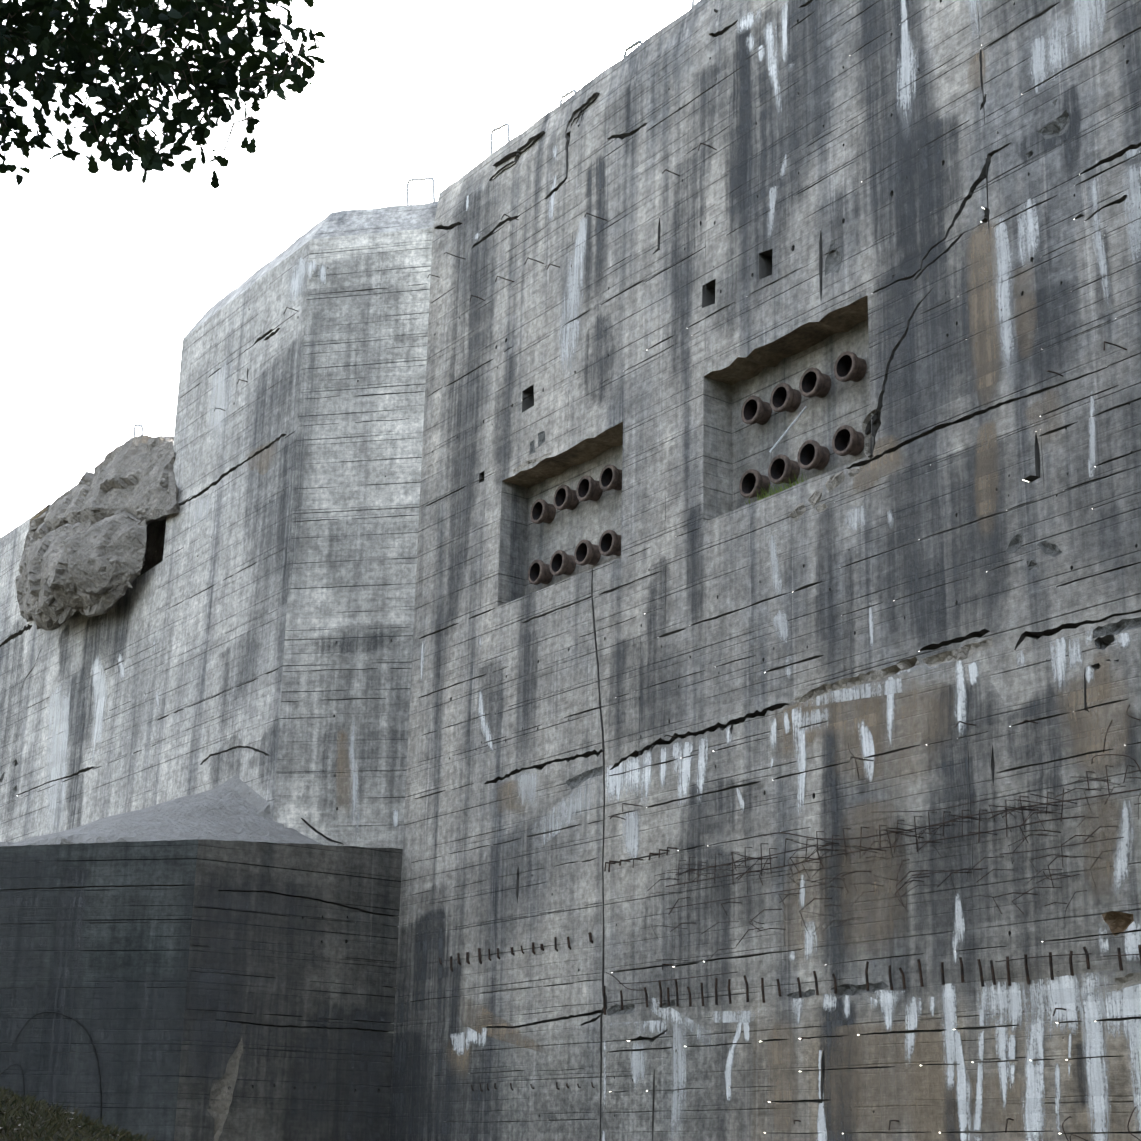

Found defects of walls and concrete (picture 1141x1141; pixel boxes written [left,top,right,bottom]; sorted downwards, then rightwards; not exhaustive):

crack [489,92,600,199]
leakage [672,0,821,356]
leakage [856,0,1070,444]
crack [846,143,1109,469]
spalling [1037,99,1070,139]
crack [179,434,287,506]
crack [484,569,789,1141]
leakage [770,668,911,1141]
leakage [887,629,1094,972]
leakage [870,947,1141,1141]
crack [1014,609,1141,651]
spalling [1091,617,1141,670]